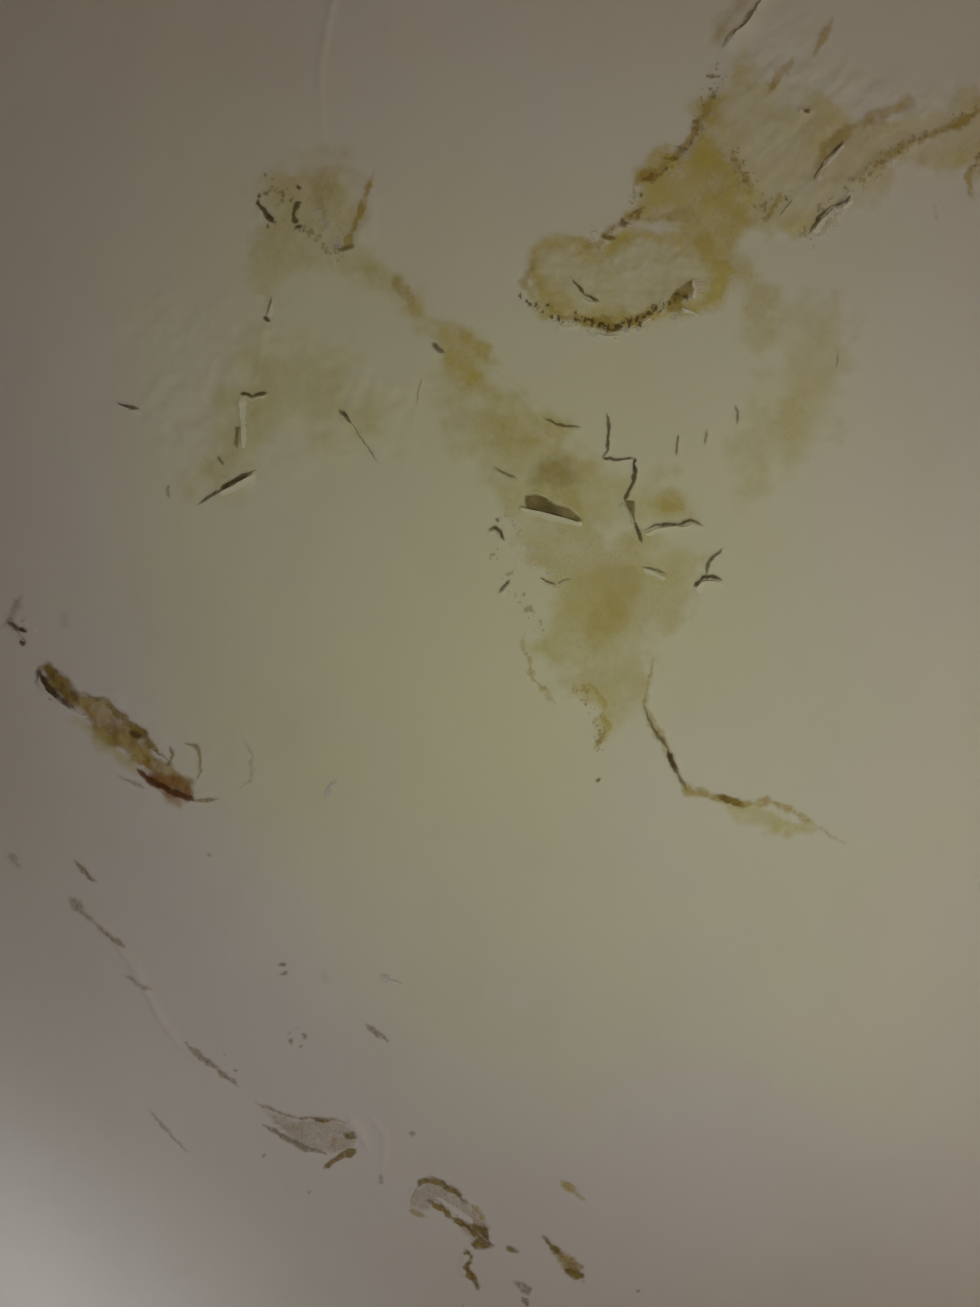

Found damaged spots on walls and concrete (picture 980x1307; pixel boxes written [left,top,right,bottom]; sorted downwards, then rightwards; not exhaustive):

damp [292,186,301,228]
damp [604,100,734,253]
damp [519,224,745,333]
peeling [515,486,588,534]
peeling [600,419,647,540]
crack [641,519,703,586]
flaking render [27,665,190,788]
crack [646,698,692,772]
flaking render [250,1101,377,1168]
flaking render [399,1179,489,1288]
flaking render [545,1240,583,1279]